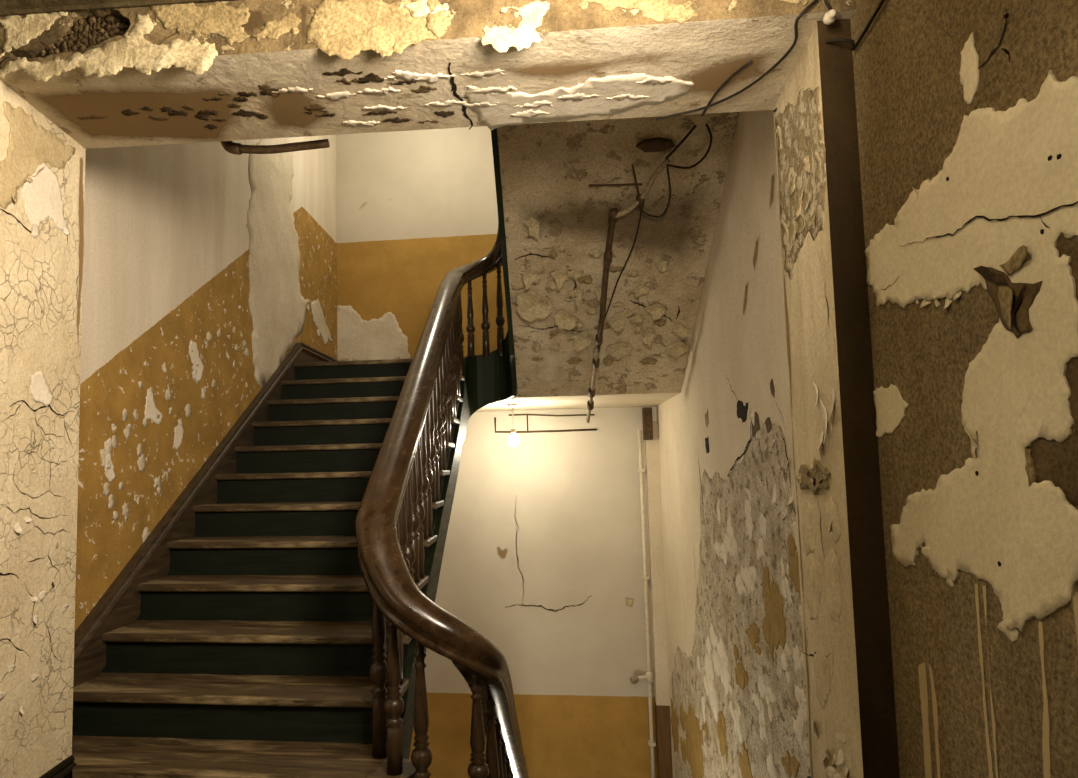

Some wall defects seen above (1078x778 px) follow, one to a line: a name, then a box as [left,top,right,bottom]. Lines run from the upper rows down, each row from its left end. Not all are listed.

peeling [189,139,410,400]
peeling [0,0,699,130]
crack [448,63,473,130]
peeling [775,86,826,278]
peeling [865,32,1078,642]
crack [903,201,1078,247]
crack [0,400,75,682]
crack [505,496,592,612]
peeling [671,382,832,778]
water stain [918,662,941,778]
water stain [975,583,998,778]
water stain [1039,621,1051,778]